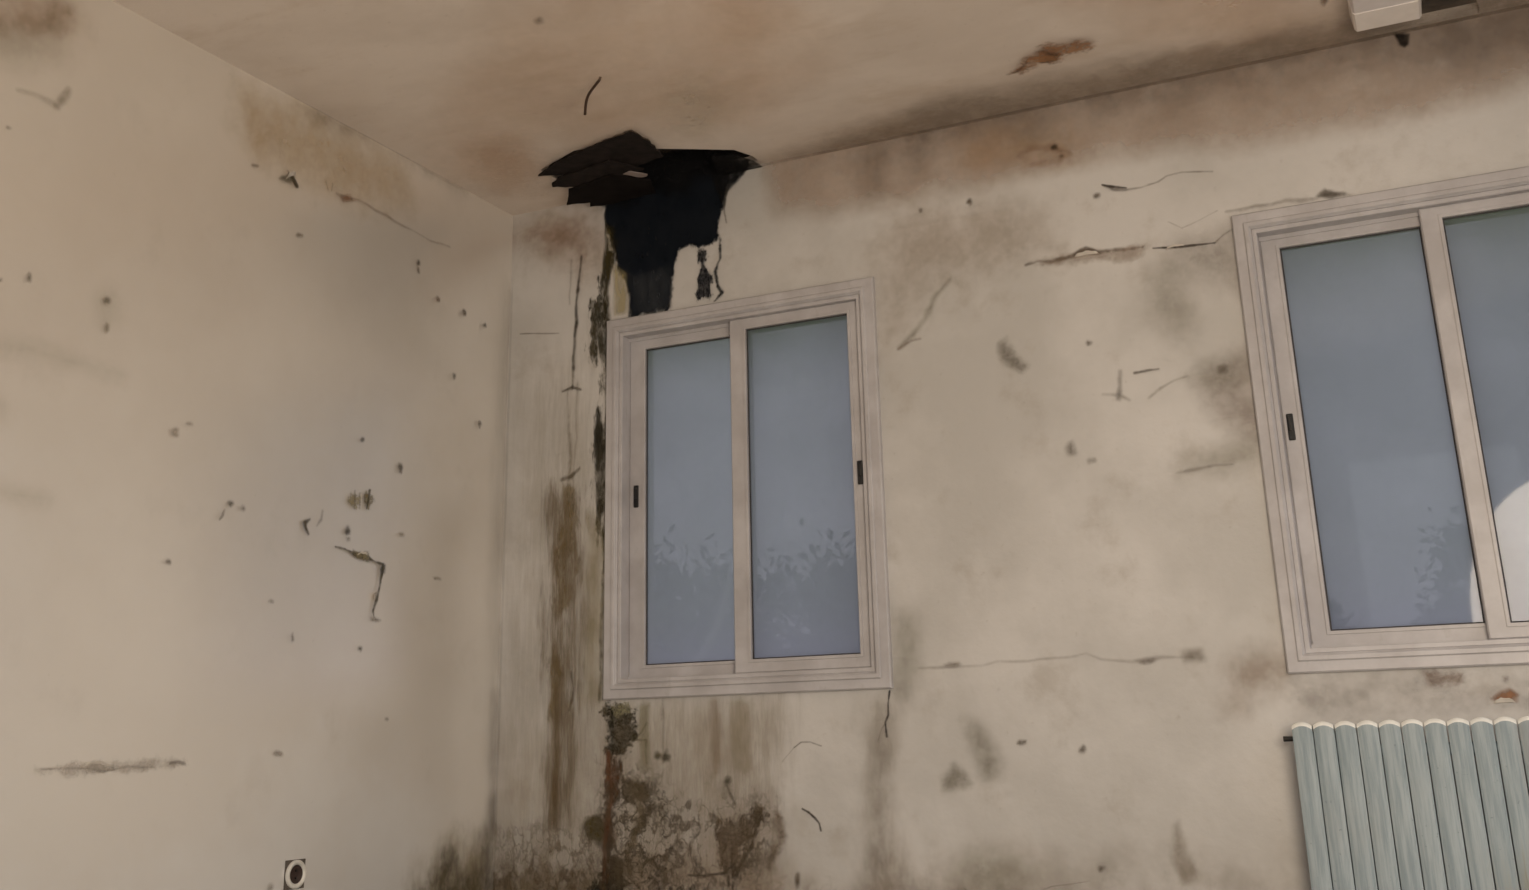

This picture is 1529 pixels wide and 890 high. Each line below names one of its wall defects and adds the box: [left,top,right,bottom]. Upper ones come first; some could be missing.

crack [1025,243,1208,265]
leakage [440,0,1529,890]
crack [335,527,385,621]